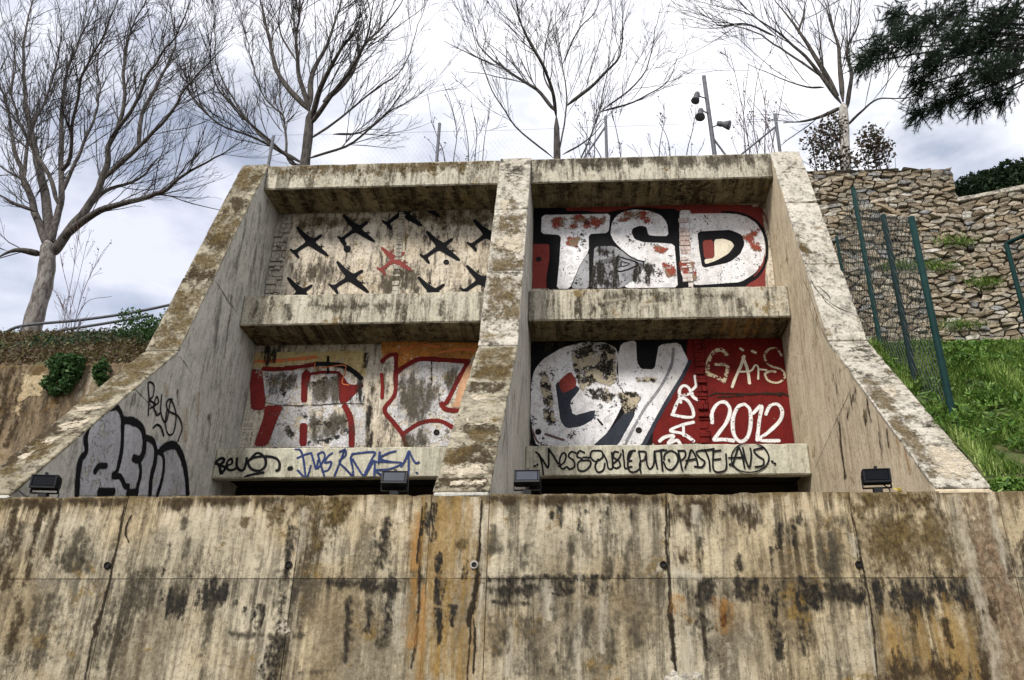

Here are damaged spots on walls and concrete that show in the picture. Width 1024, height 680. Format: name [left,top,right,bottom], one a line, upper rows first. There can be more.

peeling [550,210,654,247]
peeling [652,245,697,280]
flaking render [539,371,556,425]
flaking render [571,343,657,415]
leakage [0,498,127,668]
crack [84,506,132,680]
leakage [91,497,306,680]
leakage [326,515,401,663]
corrosion [407,496,473,680]
leakage [433,423,763,679]
crack [664,495,677,672]
leakage [733,509,1000,680]